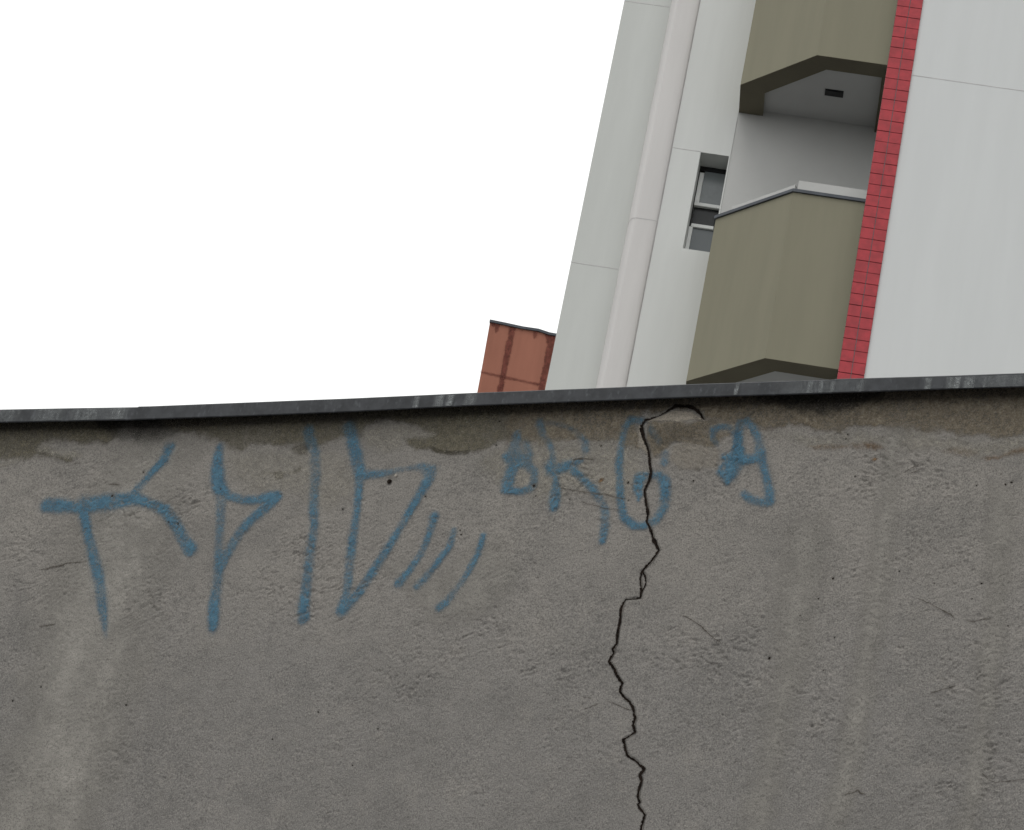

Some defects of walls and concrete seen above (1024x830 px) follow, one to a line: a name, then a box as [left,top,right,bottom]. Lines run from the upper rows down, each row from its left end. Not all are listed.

water stain [0,377,1024,830]
crack [563,404,704,830]